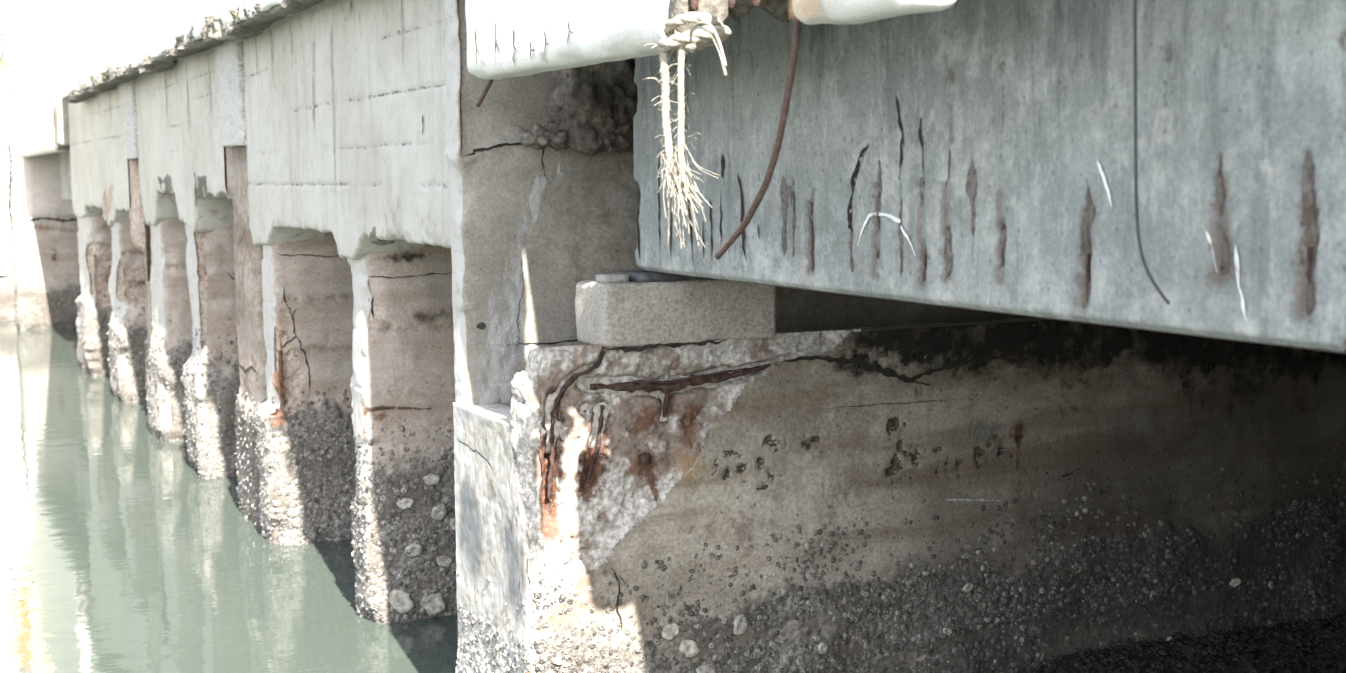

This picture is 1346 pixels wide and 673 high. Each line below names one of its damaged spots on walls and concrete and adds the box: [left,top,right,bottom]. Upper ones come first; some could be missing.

rust [271,372,286,427]
crack [273,252,336,397]
crack [368,272,450,319]
rust [539,386,610,540]
rust [628,395,700,501]
spalling [508,329,861,622]
water stain [835,320,1346,412]